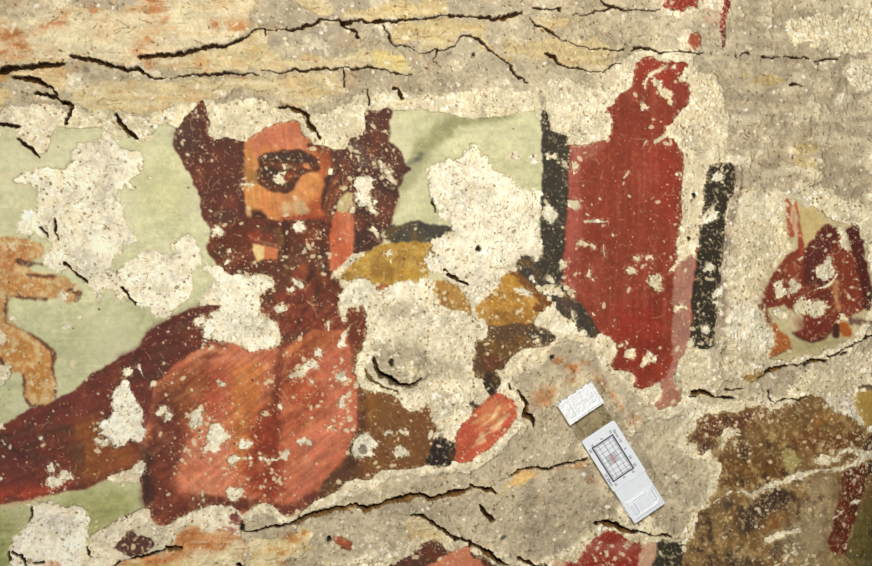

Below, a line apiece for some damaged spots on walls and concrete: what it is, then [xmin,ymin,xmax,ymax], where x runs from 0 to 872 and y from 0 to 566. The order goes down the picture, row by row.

crack [0,0,704,125]
crack [0,123,41,159]
crack [279,106,322,141]
spalling [0,0,674,353]
spalling [648,65,730,293]
spalling [335,144,558,443]
spalling [674,184,872,398]
spalling [497,307,661,407]
crack [689,335,872,404]
spalling [8,487,315,566]
crack [244,483,536,566]
crack [593,519,673,538]